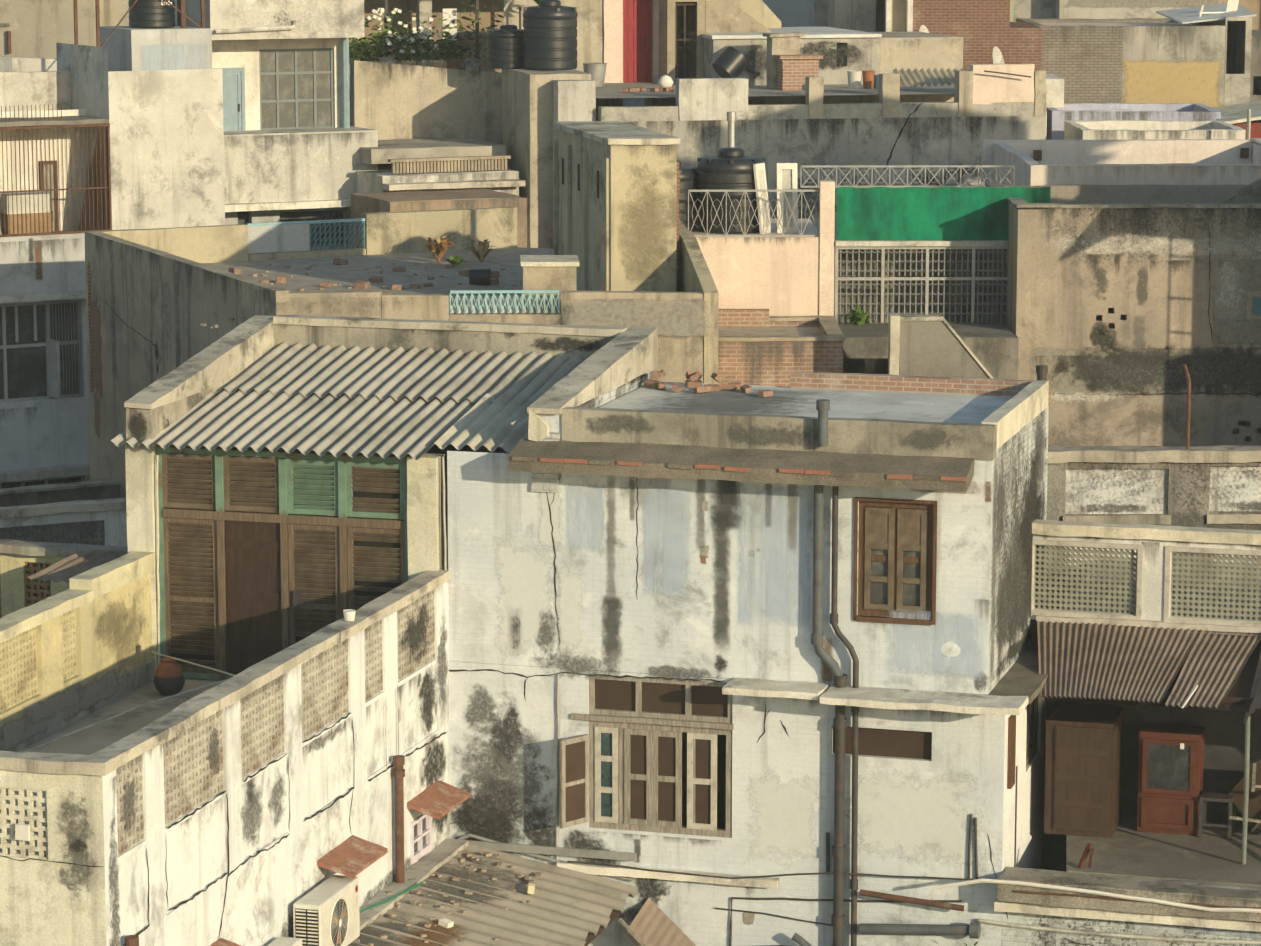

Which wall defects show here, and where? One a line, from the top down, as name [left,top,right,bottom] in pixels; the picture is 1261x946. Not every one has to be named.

damp [1042,208,1261,315]
damp [1032,319,1261,401]
crack [449,474,722,701]
damp [649,480,744,681]
damp [975,412,1047,690]
damp [1072,462,1261,548]
mould [242,777,284,853]
crack [123,686,447,945]
damp [282,910,294,938]
damp [399,595,448,787]
damp [432,687,616,865]
damp [620,878,667,921]